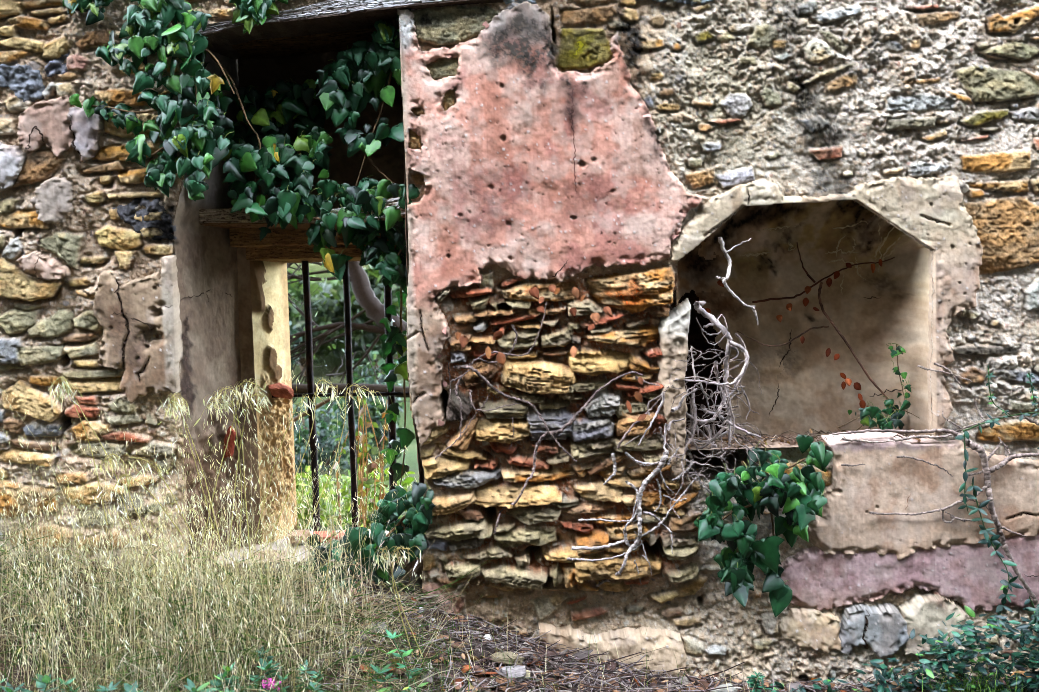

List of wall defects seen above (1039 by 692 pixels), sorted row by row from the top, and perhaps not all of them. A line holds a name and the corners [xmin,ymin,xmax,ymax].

leakage [484,10,556,89]
crack [570,88,578,194]
leakage [561,77,588,131]
crack [112,280,232,381]
flaking render [397,1,1039,655]